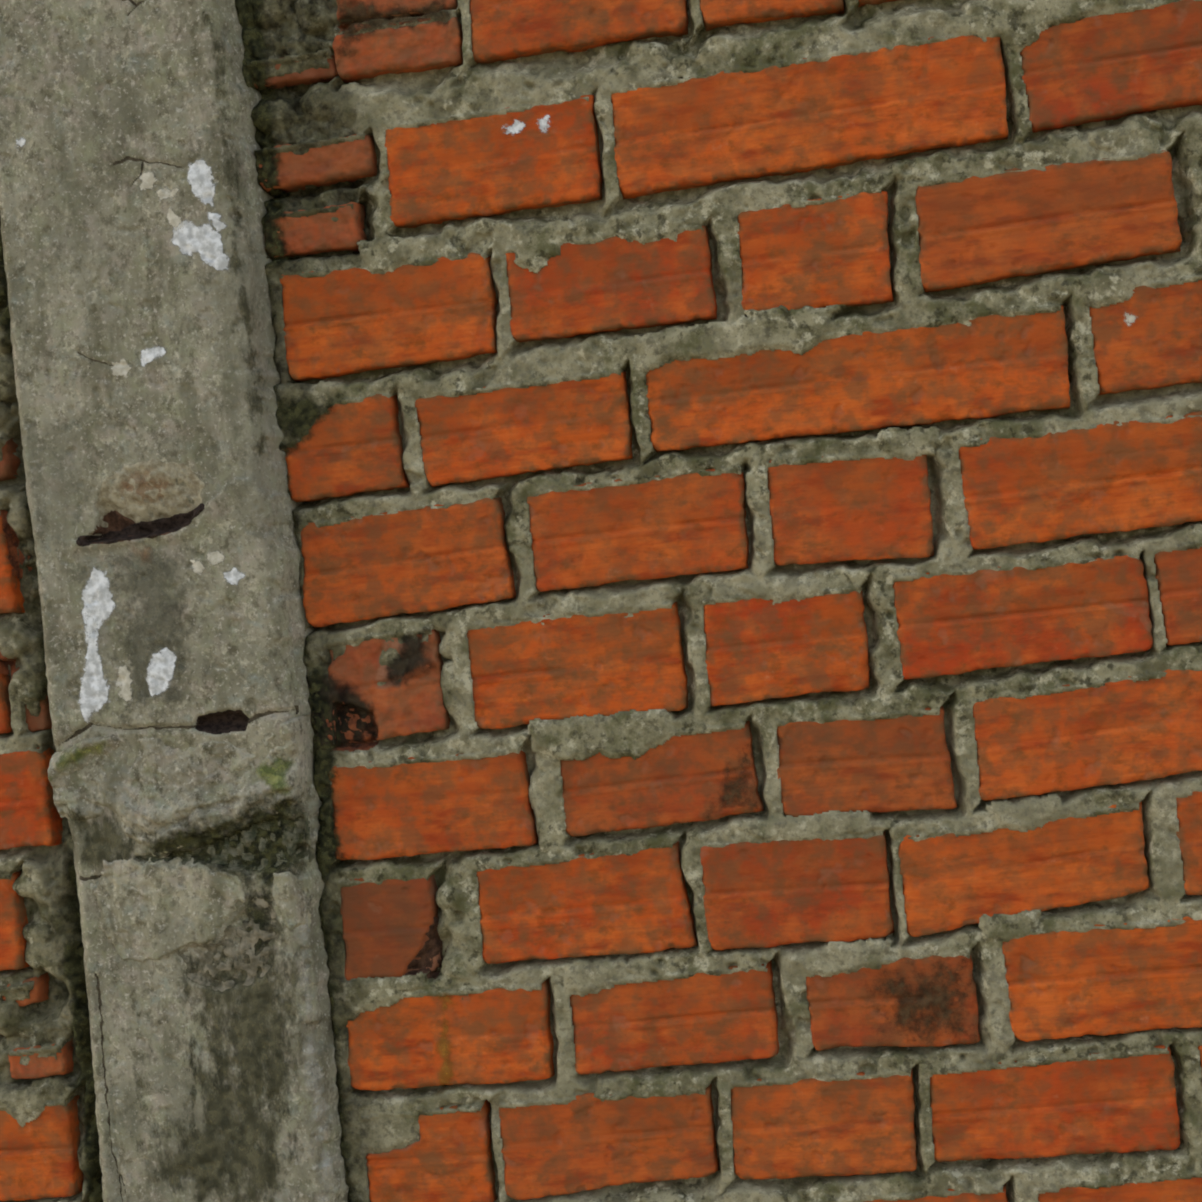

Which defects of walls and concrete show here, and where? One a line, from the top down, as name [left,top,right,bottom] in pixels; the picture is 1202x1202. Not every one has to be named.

spalling [76,459,208,547]
crack [53,705,299,748]
spalling [326,709,379,752]